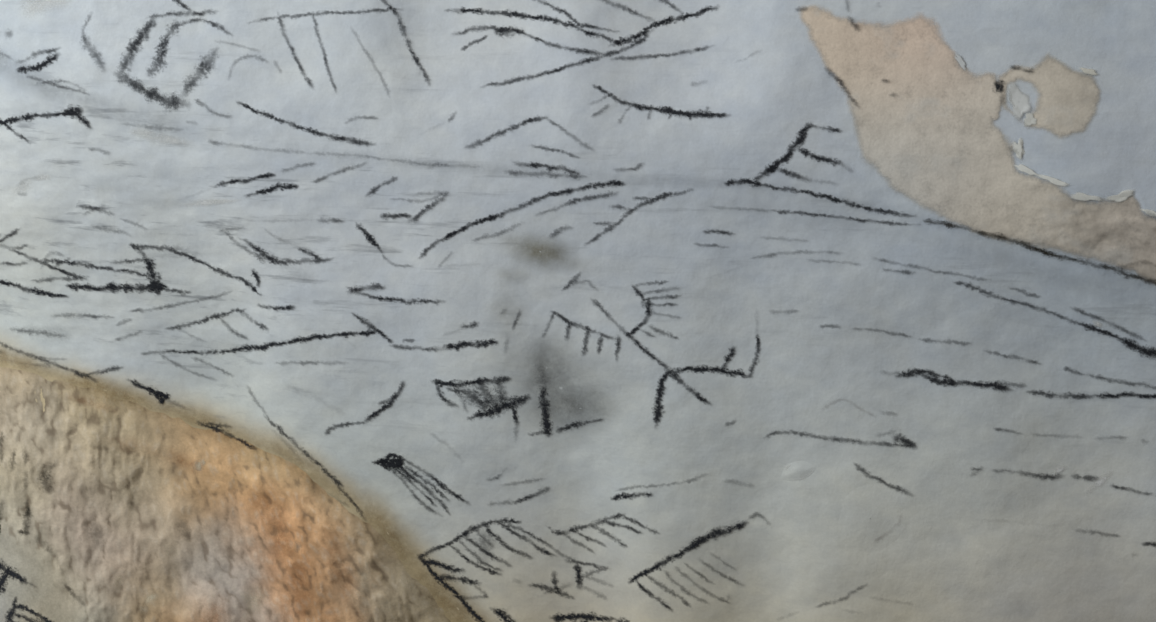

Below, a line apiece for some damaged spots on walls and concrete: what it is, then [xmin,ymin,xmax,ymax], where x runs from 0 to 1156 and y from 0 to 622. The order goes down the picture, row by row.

spalling [801,6,1156,282]